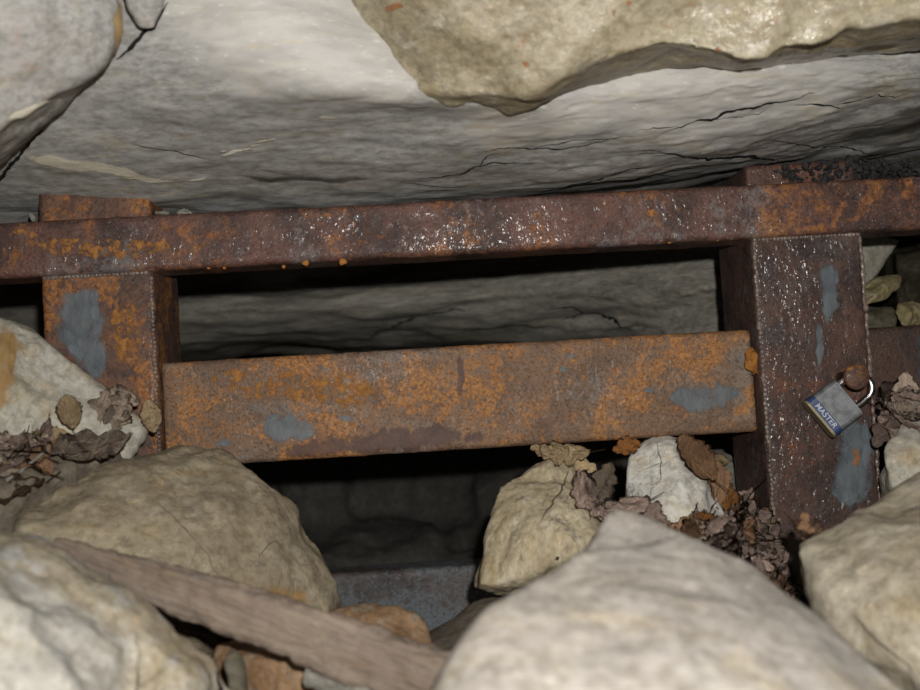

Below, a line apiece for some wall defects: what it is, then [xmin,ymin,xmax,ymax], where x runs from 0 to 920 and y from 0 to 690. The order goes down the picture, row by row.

corrosion [10,224,170,259]
corrosion [111,297,140,370]
corrosion [212,367,387,409]
corrosion [457,357,465,396]
corrosion [745,347,758,375]
corrosion [286,423,482,458]